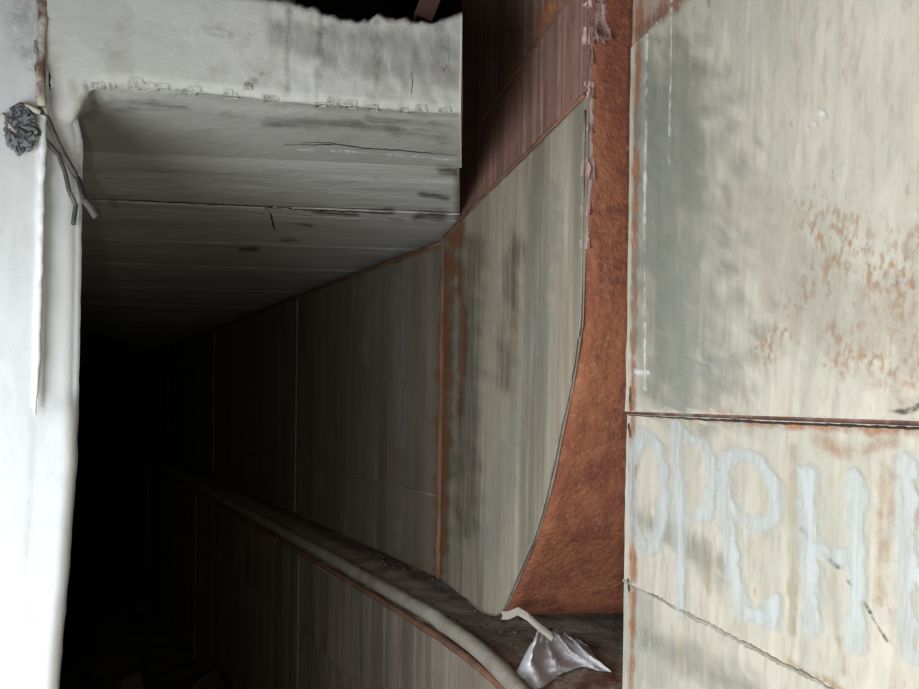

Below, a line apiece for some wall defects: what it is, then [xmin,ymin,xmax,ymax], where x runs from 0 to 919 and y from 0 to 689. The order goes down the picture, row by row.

rust [629,0,681,446]
rust [577,670,614,689]